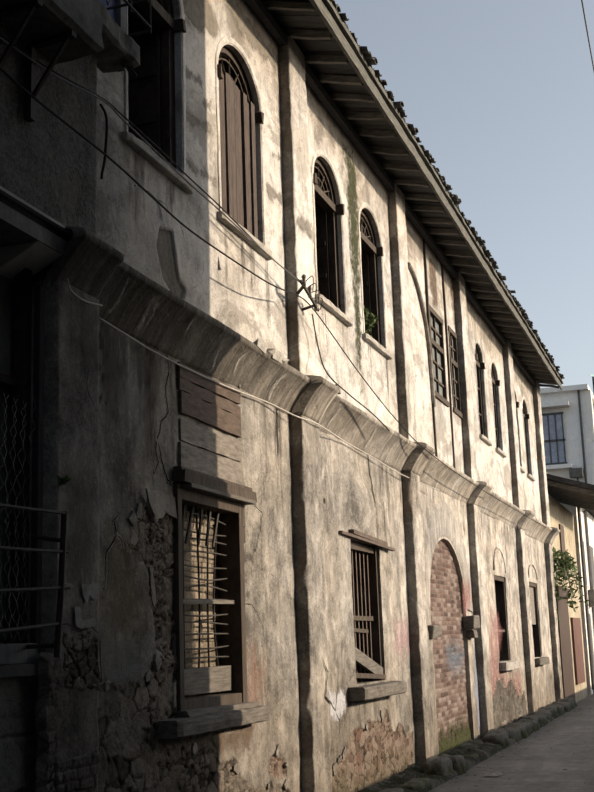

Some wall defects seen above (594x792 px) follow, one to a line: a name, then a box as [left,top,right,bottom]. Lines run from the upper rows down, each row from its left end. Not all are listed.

crack [153,354,174,490]
spalling [97,488,290,792]
spalling [332,710,413,792]
spalling [492,677,528,729]